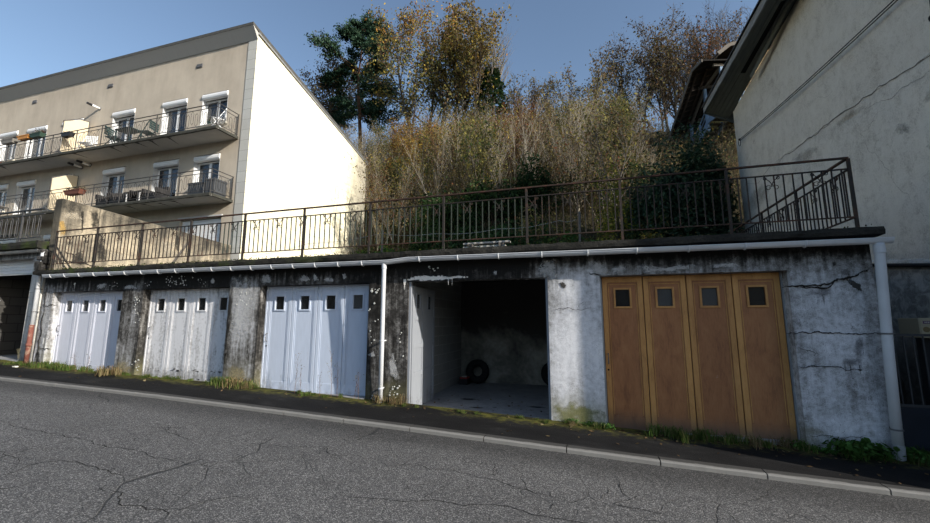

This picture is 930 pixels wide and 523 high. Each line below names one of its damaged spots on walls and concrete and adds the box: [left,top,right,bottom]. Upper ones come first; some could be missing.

crack [747,55,930,184]
peeling [403,275,468,287]
crack [782,270,868,289]
water stain [222,275,270,360]
crack [786,331,876,371]